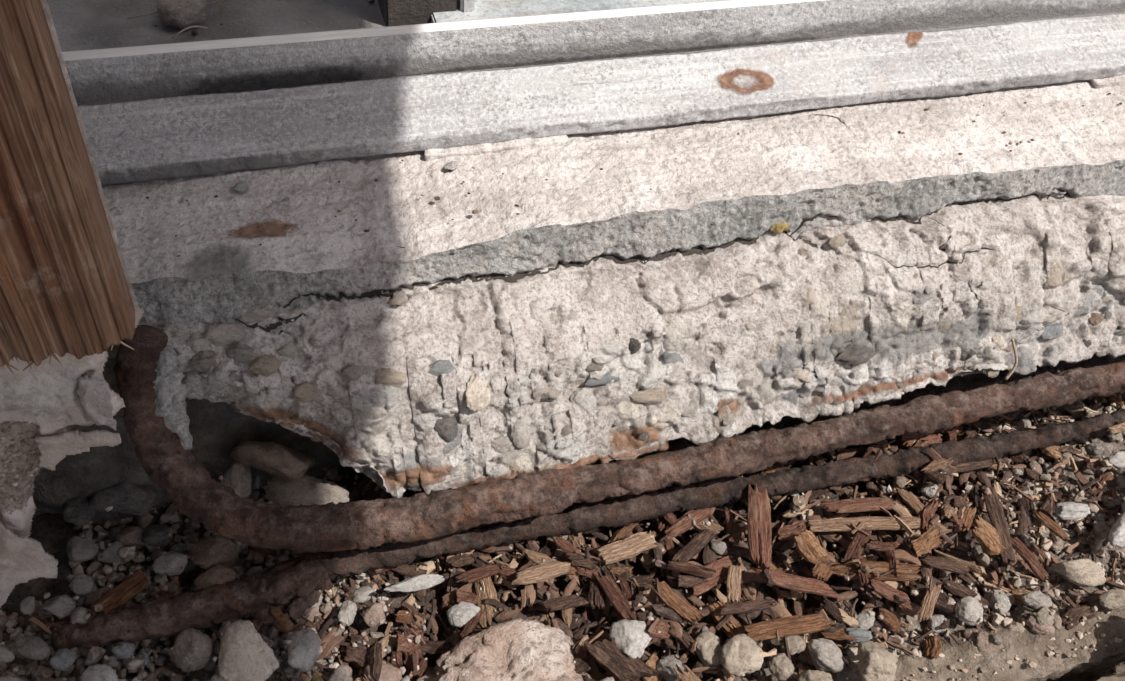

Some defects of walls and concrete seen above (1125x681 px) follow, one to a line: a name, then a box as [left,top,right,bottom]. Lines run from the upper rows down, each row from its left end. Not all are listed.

rust [718,69,774,93]
rust [906,32,922,47]
rust [231,220,295,238]
crack [238,189,1071,335]
spalling [149,195,1125,498]
peeling [0,374,121,608]
rust [51,325,1125,651]